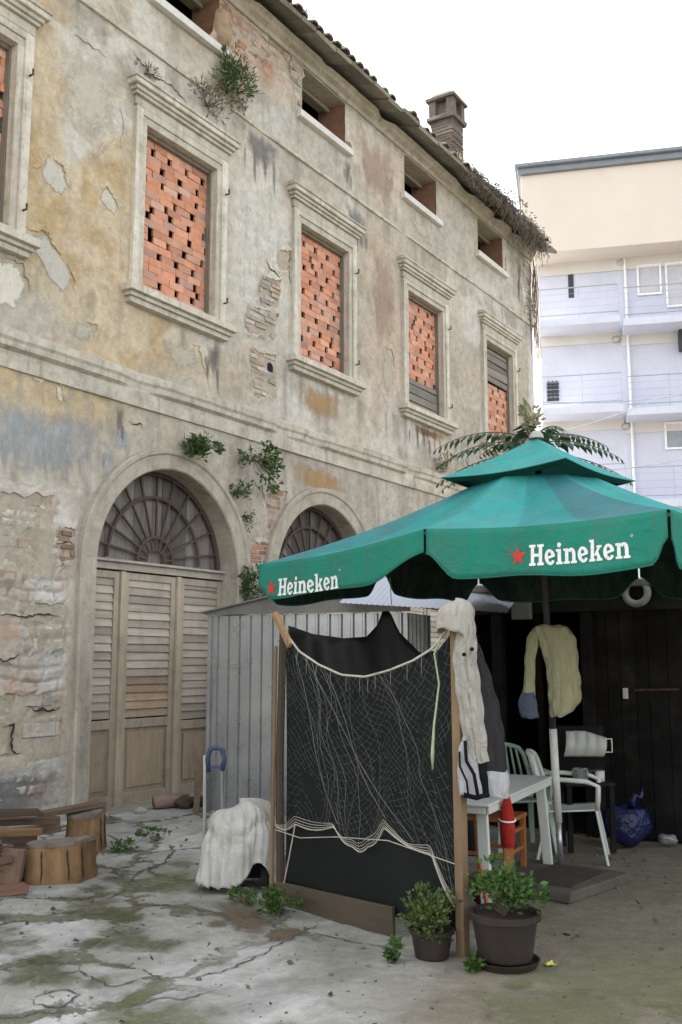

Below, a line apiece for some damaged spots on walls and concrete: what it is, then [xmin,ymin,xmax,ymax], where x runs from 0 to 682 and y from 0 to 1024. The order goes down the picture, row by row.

spalling [210,2,305,116]
flaking render [30,148,73,194]
flaking render [98,180,122,214]
damp [245,136,275,192]
flaking render [0,222,80,308]
spalling [243,242,292,407]
spalling [0,480,79,660]
crack [0,611,55,619]
crack [0,706,60,756]
crack [108,834,176,899]